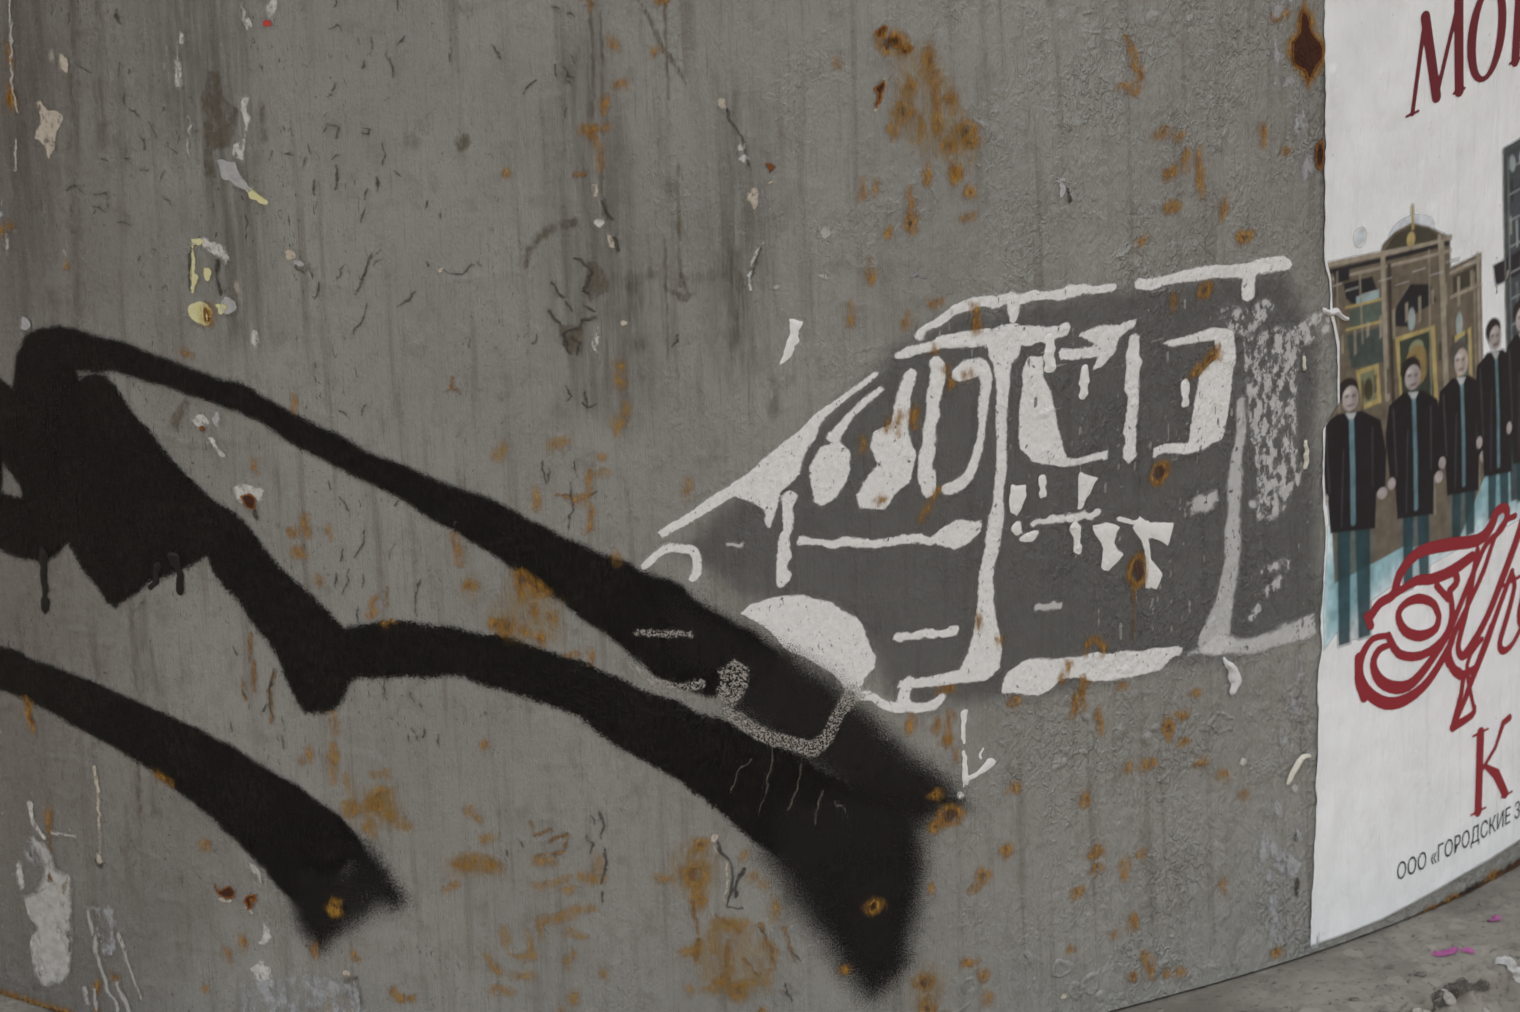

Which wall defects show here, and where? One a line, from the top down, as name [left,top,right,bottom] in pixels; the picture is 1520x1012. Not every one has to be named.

peeling [8,0,18,113]
peeling [50,52,68,73]
corrosion [1272,3,1325,87]
peeling [35,101,63,158]
corrosion [874,25,977,238]
peeling [188,238,239,326]
corrosion [489,569,556,644]
peeling [16,801,142,1012]
corrosion [662,838,795,999]